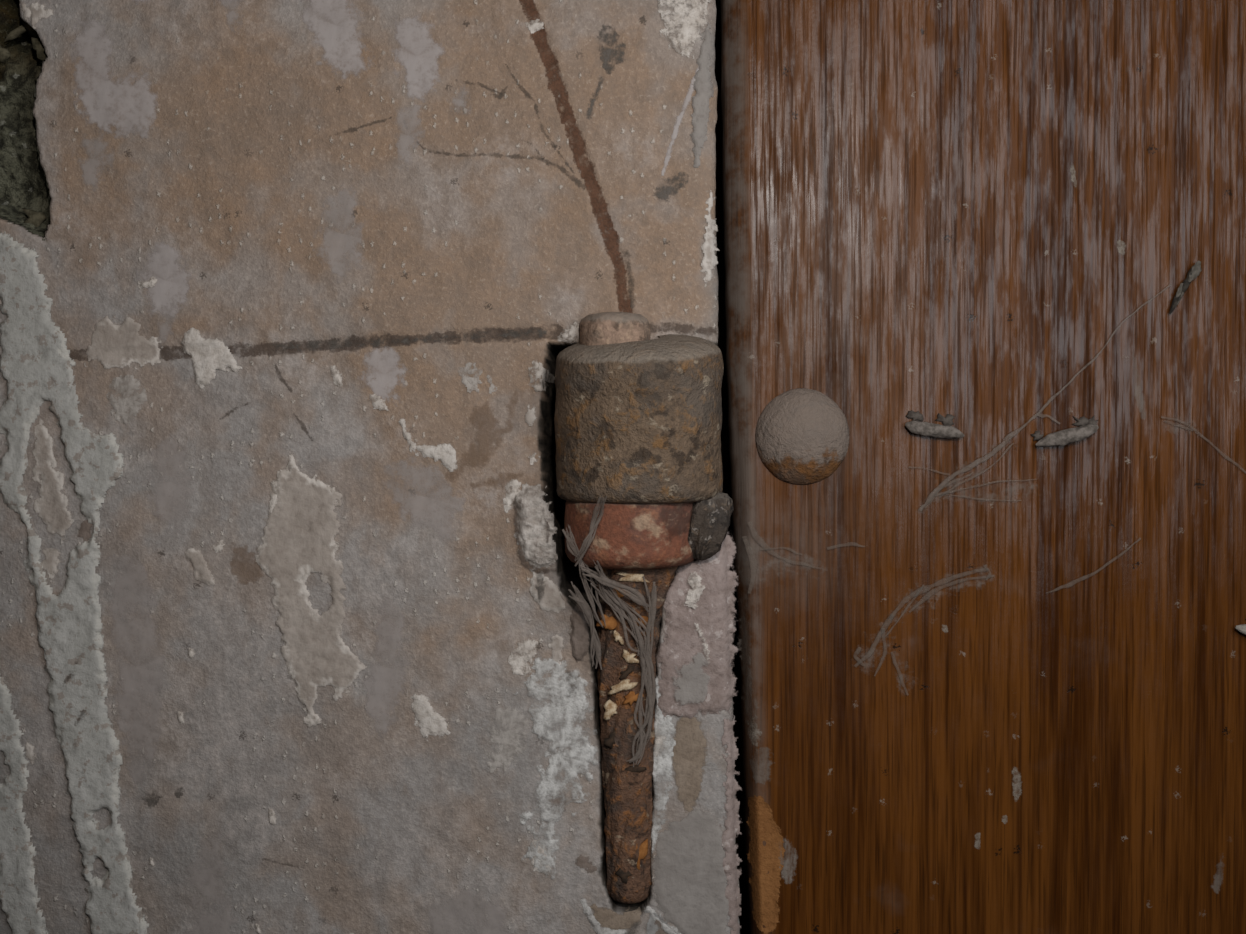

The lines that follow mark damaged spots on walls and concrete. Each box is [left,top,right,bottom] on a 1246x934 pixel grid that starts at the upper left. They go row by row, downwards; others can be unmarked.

spalling [0,0,53,240]
leakage [141,243,189,340]
crack [67,349,87,361]
crack [160,346,191,361]
crack [228,325,563,434]
leakage [32,419,72,584]
leakage [488,658,598,878]